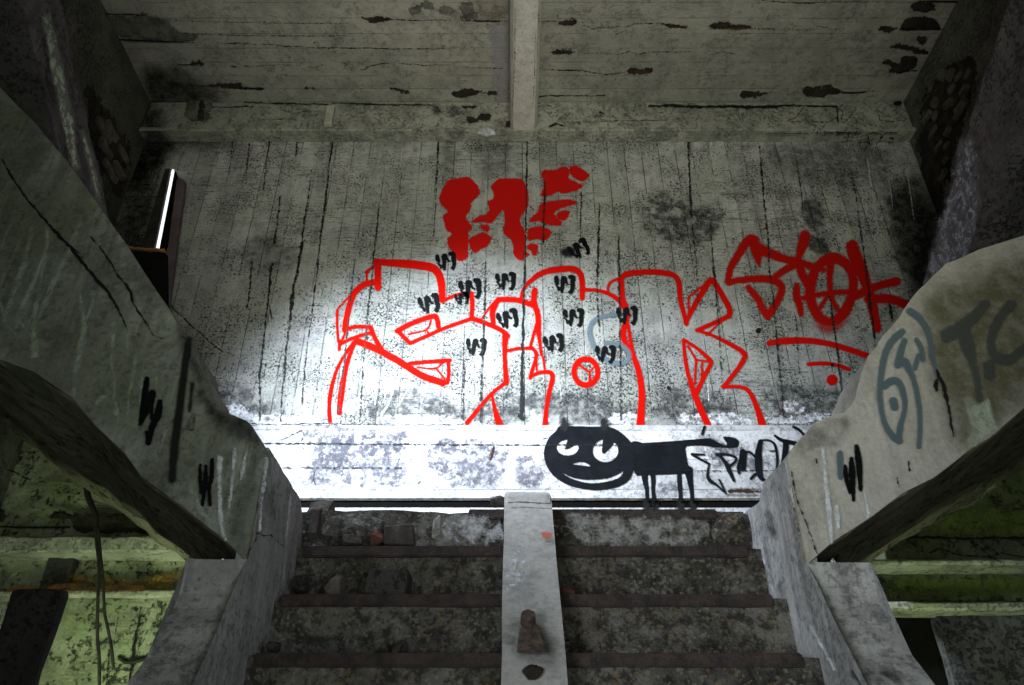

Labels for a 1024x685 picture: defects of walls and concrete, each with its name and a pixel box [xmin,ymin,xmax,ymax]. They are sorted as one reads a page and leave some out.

spalling [361,0,478,23]
spalling [709,21,751,30]
spalling [878,0,958,74]
spalling [627,67,653,75]
spalling [802,84,874,99]
spalling [451,88,498,123]
damp [644,193,720,243]
crack [2,159,162,339]
corrosion [7,573,180,594]